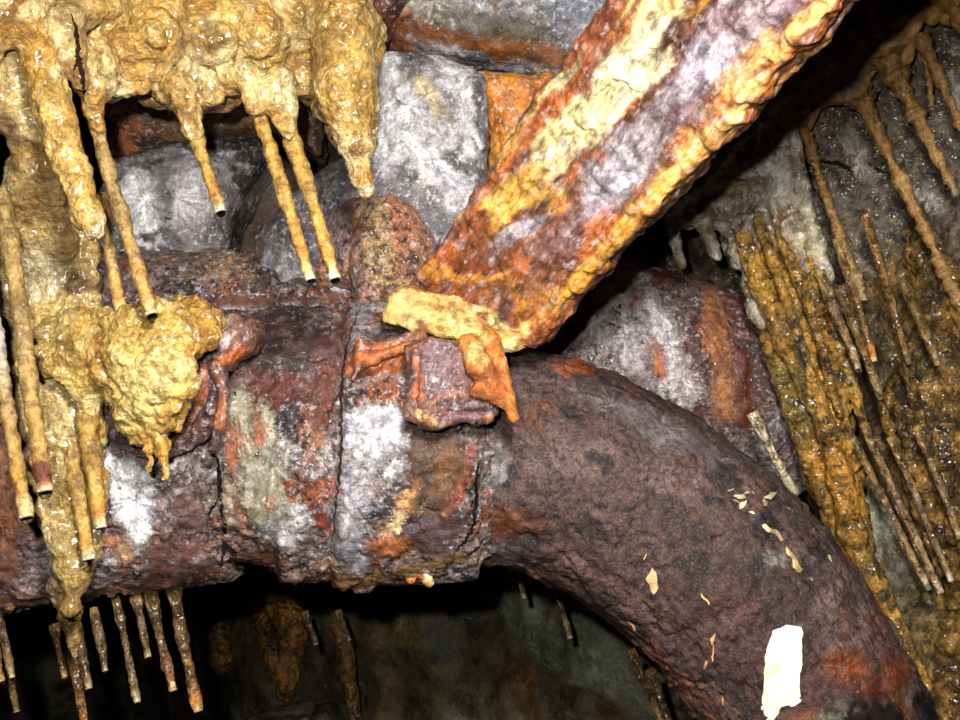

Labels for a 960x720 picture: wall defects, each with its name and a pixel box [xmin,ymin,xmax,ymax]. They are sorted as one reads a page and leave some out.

damp [124,143,210,233]
damp [836,126,878,184]
damp [913,186,948,216]
rust [210,294,350,447]
rust [680,285,756,429]
rust [0,443,25,582]
damp [104,442,190,555]
rust [96,491,216,597]
rust [224,418,269,471]
damp [219,378,308,550]
damp [332,399,476,575]
peeling [761,625,803,720]